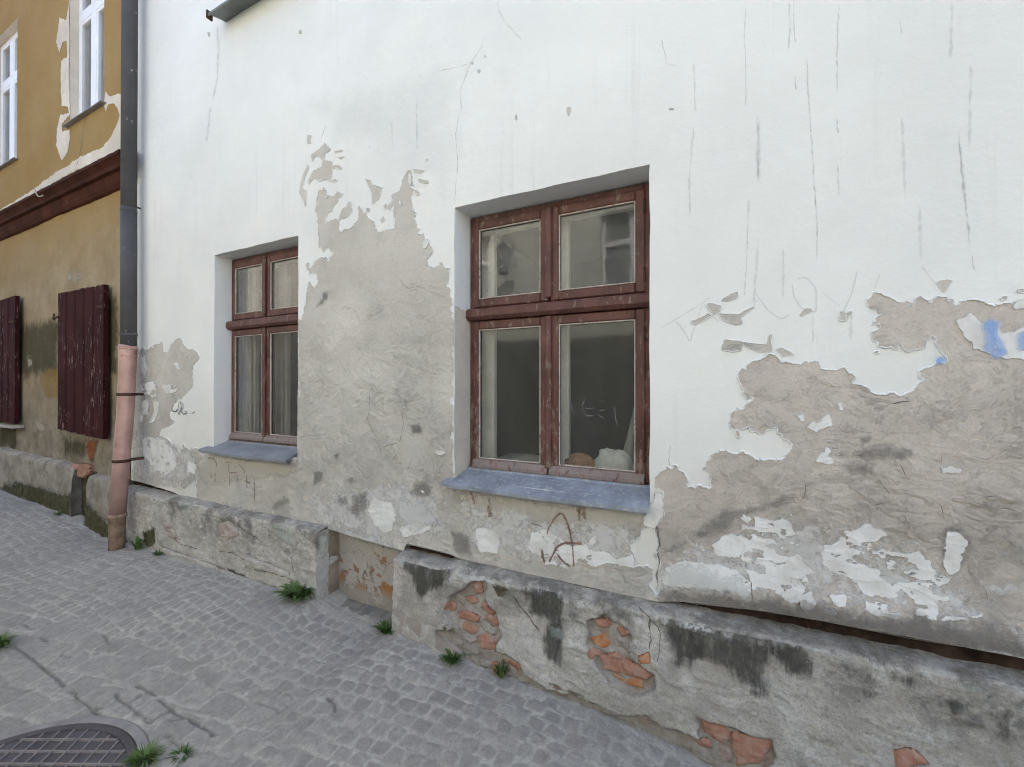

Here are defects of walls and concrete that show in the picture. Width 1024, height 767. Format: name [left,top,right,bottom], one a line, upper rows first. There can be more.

peeling [1,0,121,210]
damp [19,321,58,377]
peeling [132,135,1024,658]
damp [403,562,562,663]
spalling [436,581,776,767]
damp [659,619,812,695]
damp [661,513,1024,658]
spalling [894,747,929,767]